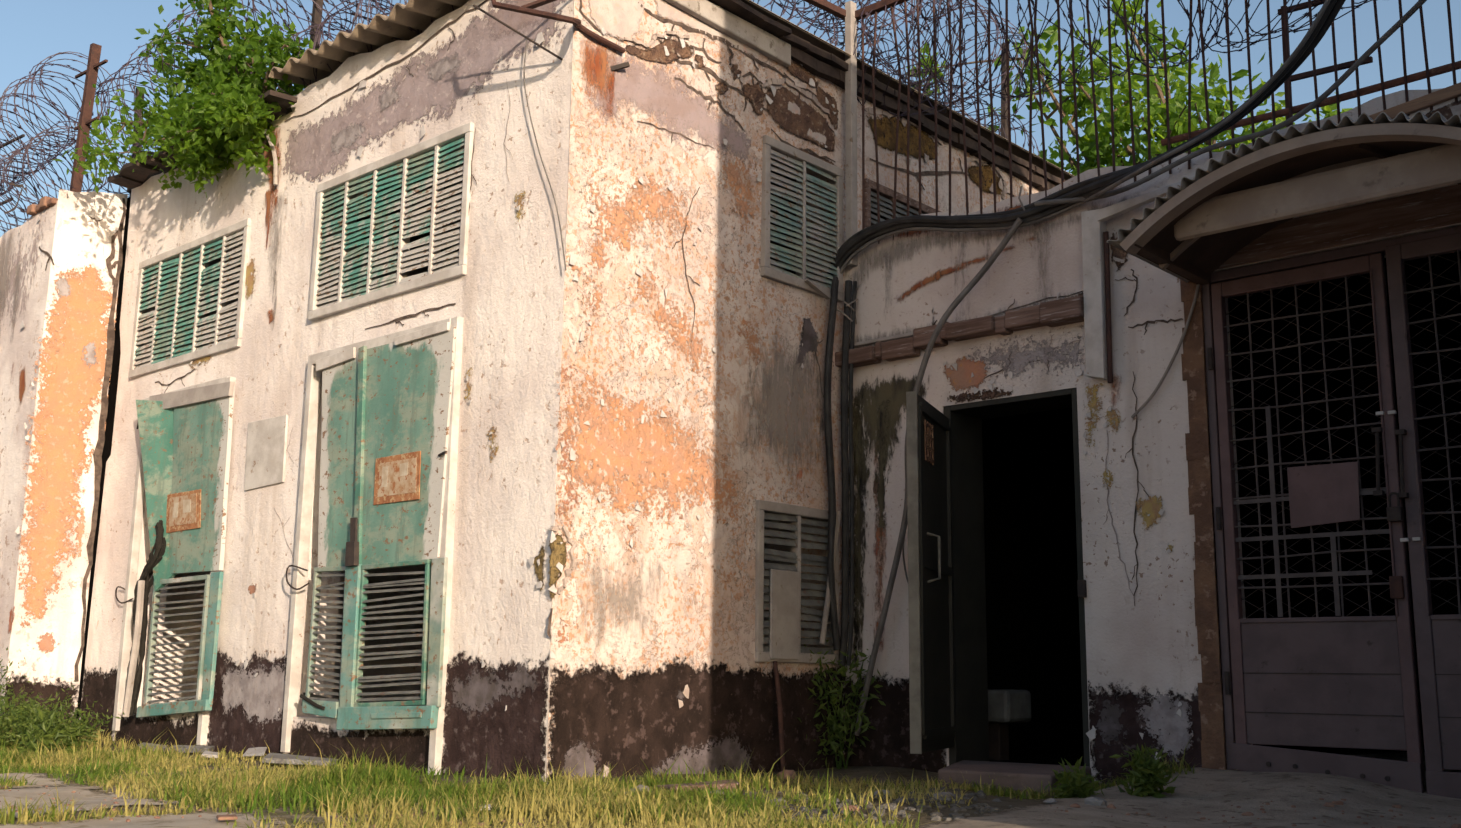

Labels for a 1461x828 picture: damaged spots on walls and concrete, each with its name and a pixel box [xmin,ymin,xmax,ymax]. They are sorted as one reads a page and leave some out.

peeling [282,0,567,188]
peeling [590,27,838,232]
flaking render [865,107,943,165]
flaking render [967,156,1008,200]
peeling [0,216,118,653]
peeling [486,427,499,463]
peeling [529,365,742,659]
water stain [848,374,929,670]
peeling [939,326,1121,460]
peeling [1103,469,1114,489]
peeling [450,659,538,716]
peeling [676,684,689,708]